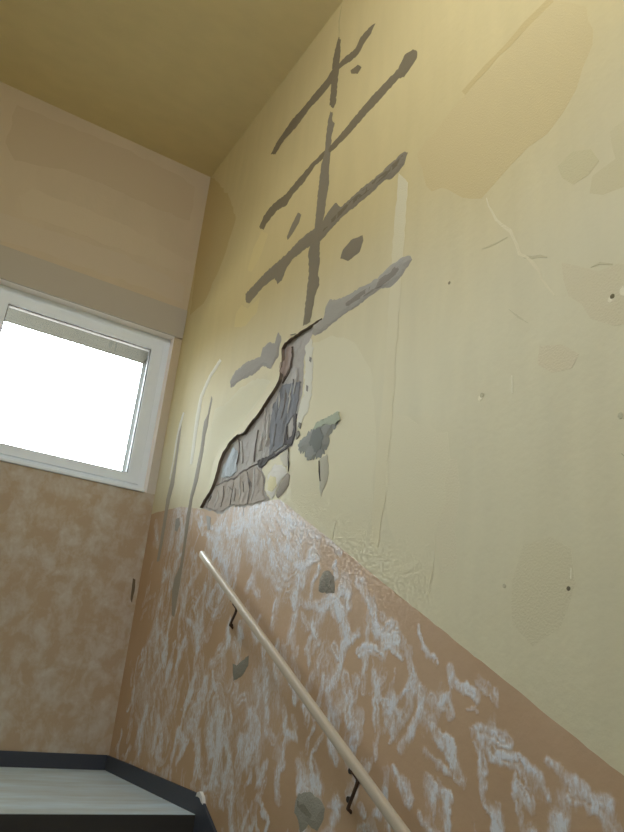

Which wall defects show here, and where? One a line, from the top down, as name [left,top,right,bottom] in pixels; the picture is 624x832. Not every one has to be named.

flaking render [200,318,322,514]
leakage [511,536,576,646]